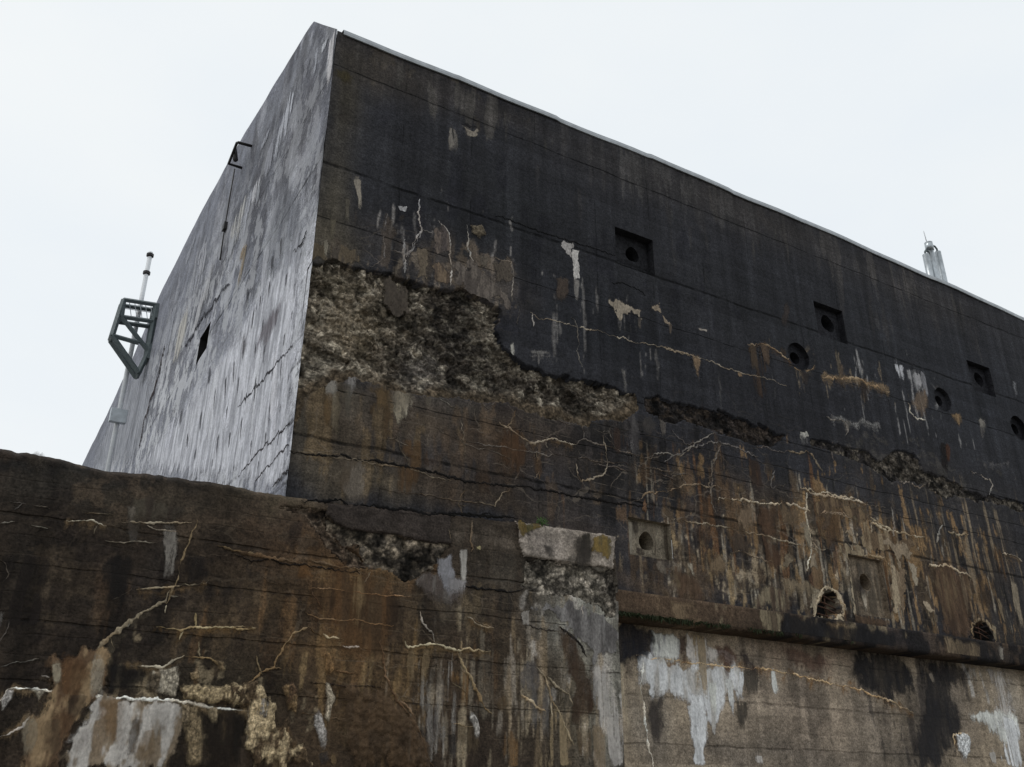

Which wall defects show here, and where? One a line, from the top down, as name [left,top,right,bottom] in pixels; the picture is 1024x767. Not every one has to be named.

spalling [294,225,784,447]
crack [370,199,786,386]
crack [0,502,257,654]
spalling [521,546,619,665]
crack [238,399,968,569]
corrosion [703,497,810,541]
corrosion [753,579,816,613]
peeling [809,492,919,640]
corrosion [980,549,1022,624]
damp [1,643,335,767]
damp [619,623,778,765]
damp [972,668,1022,767]